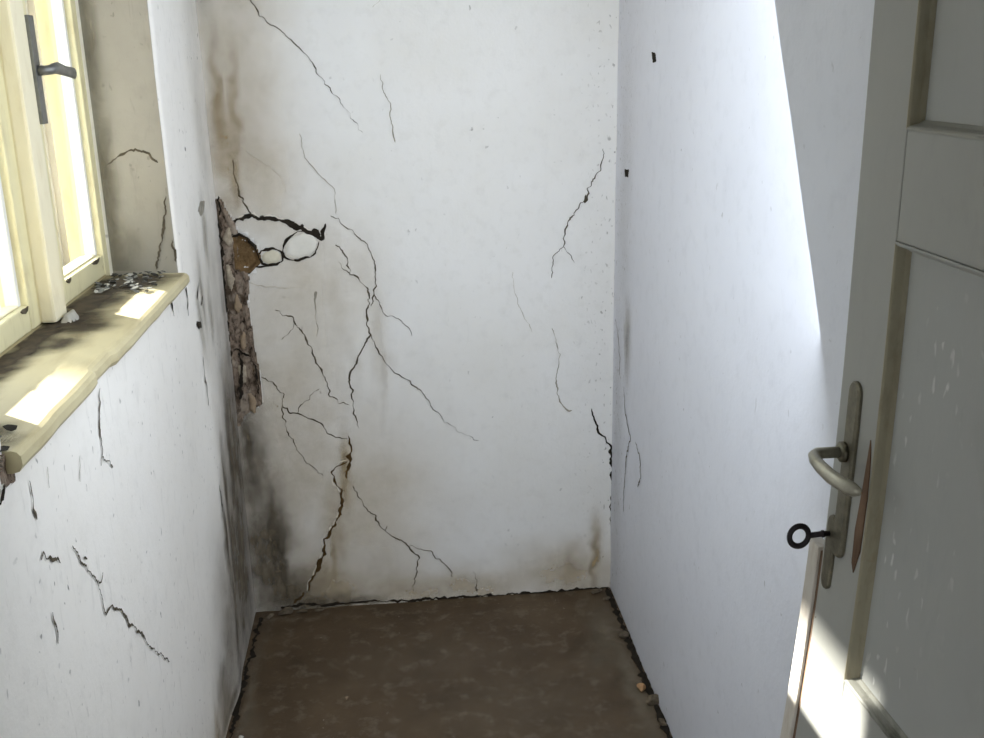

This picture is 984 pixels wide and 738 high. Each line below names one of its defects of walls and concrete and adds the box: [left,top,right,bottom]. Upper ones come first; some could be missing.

crack [250,0,357,123]
crack [380,74,395,142]
spalling [198,199,318,426]
crack [0,486,8,505]
water stain [222,376,356,683]
crack [171,133,673,738]
crack [41,547,170,662]